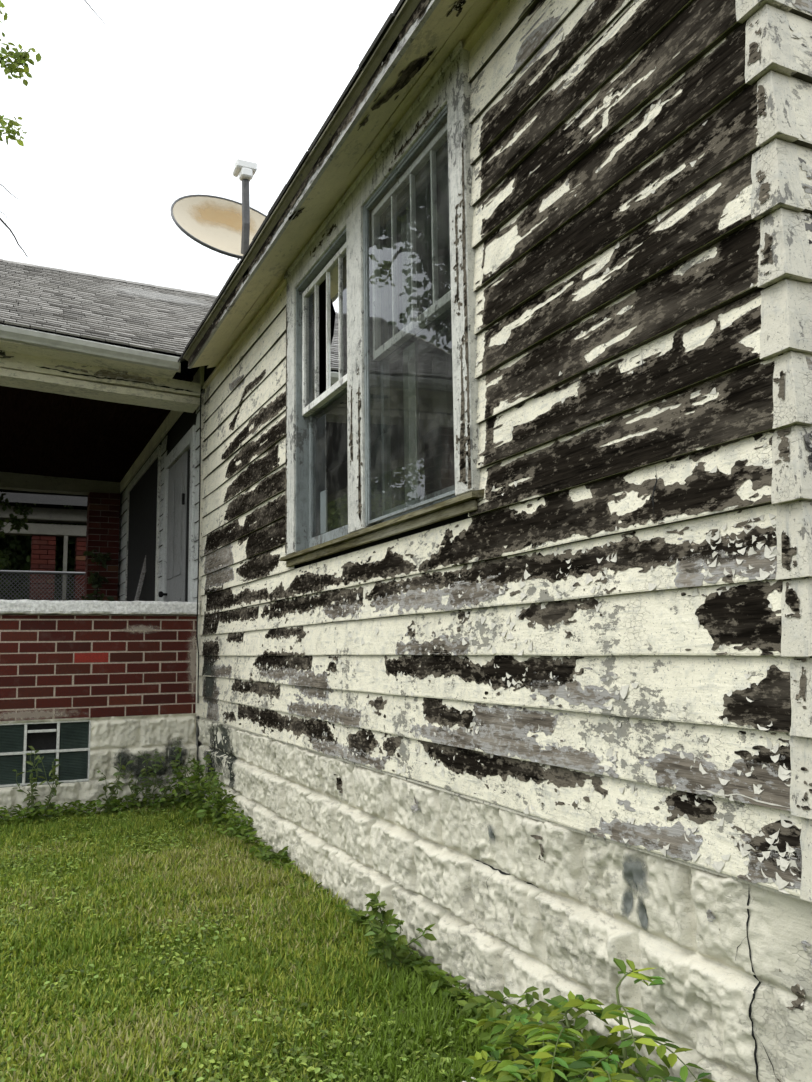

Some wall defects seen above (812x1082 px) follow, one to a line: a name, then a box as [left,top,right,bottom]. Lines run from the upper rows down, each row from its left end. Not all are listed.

peeling [188,0,812,894]
crack [735,892,777,1082]